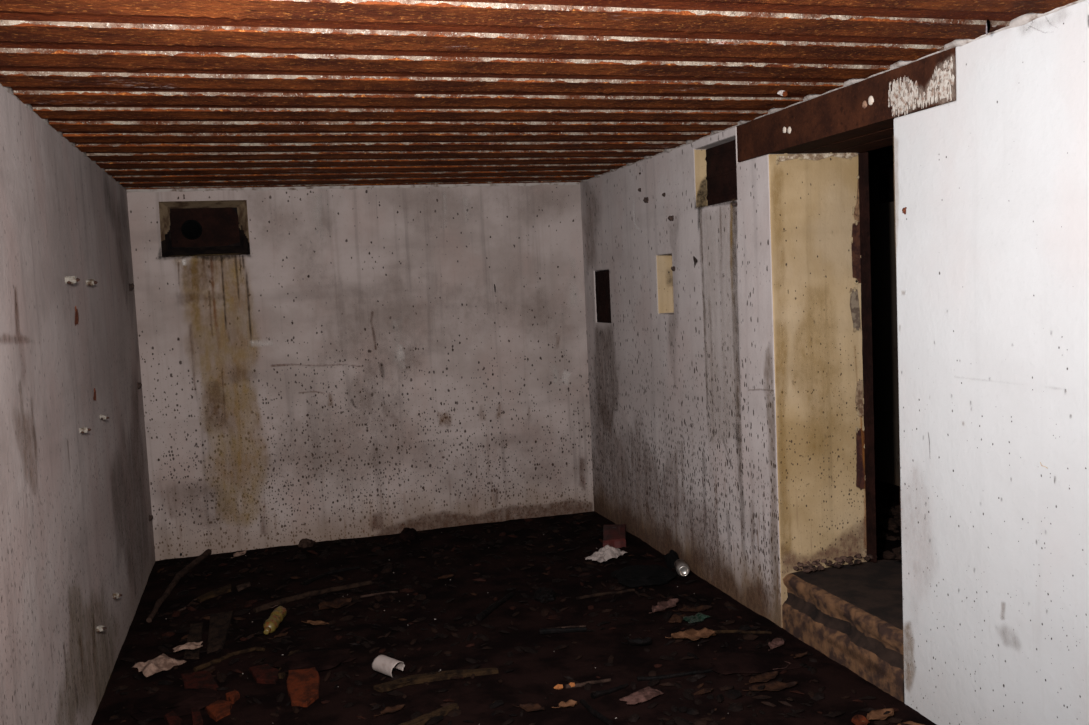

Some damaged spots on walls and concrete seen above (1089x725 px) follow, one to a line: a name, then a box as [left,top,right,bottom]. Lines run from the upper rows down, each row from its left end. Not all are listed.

corrosion [184,259,252,427]
damp [374,496,767,616]